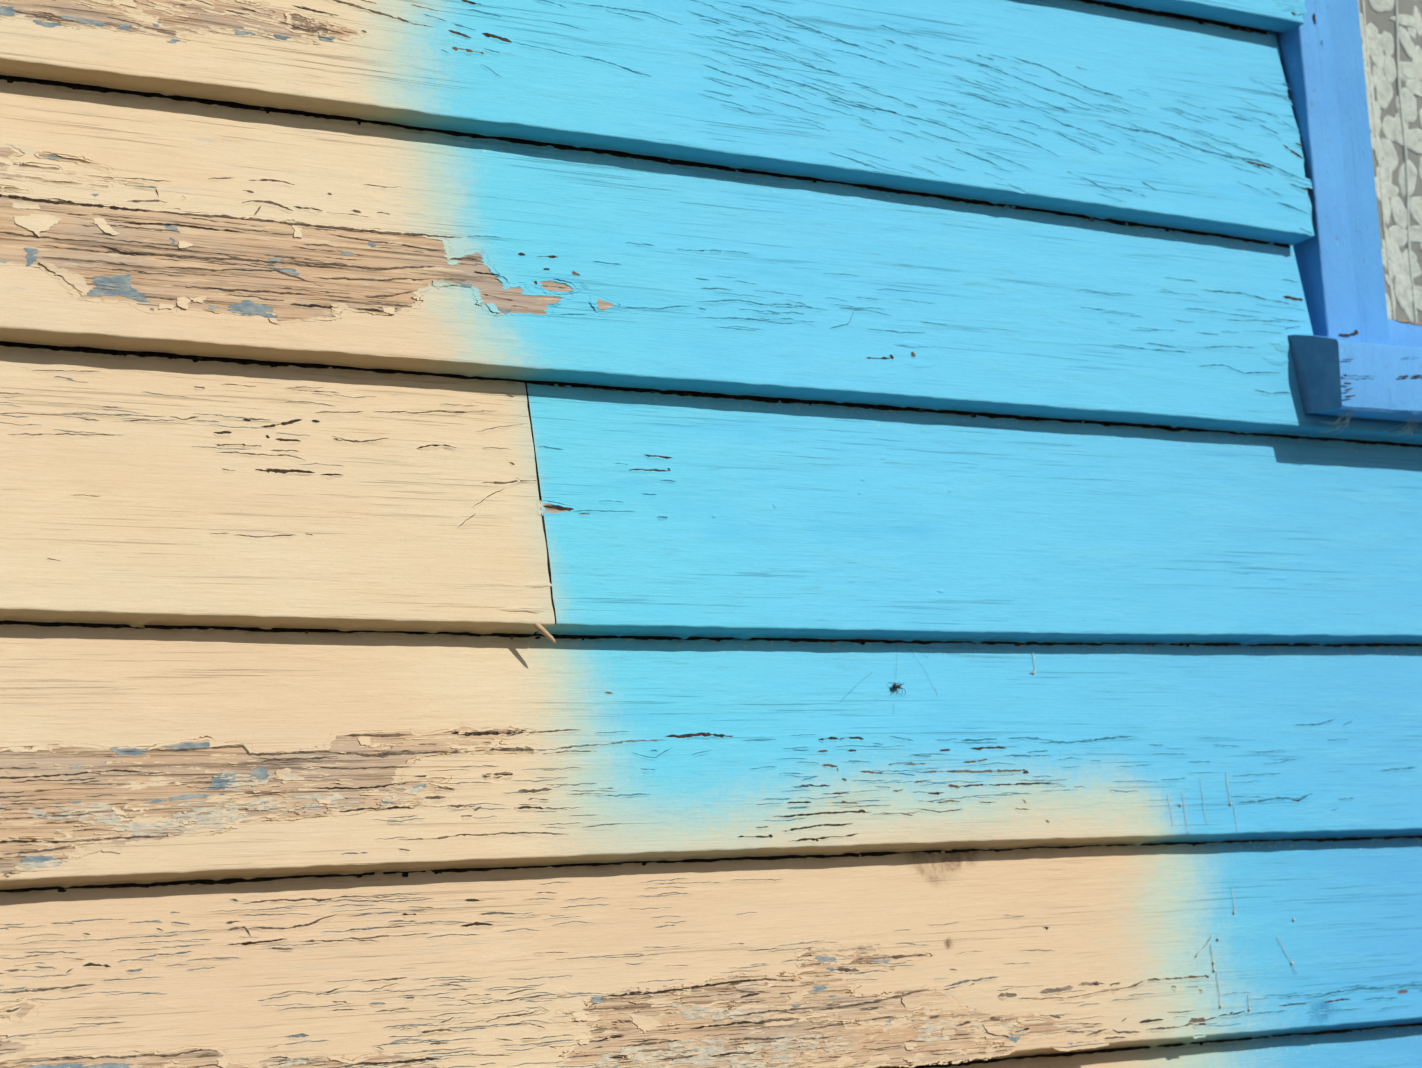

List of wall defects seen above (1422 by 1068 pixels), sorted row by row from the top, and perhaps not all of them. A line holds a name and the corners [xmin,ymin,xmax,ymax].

peeling [0,0,365,45]
peeling [0,144,620,325]
peeling [0,722,543,877]
peeling [0,943,1273,1068]